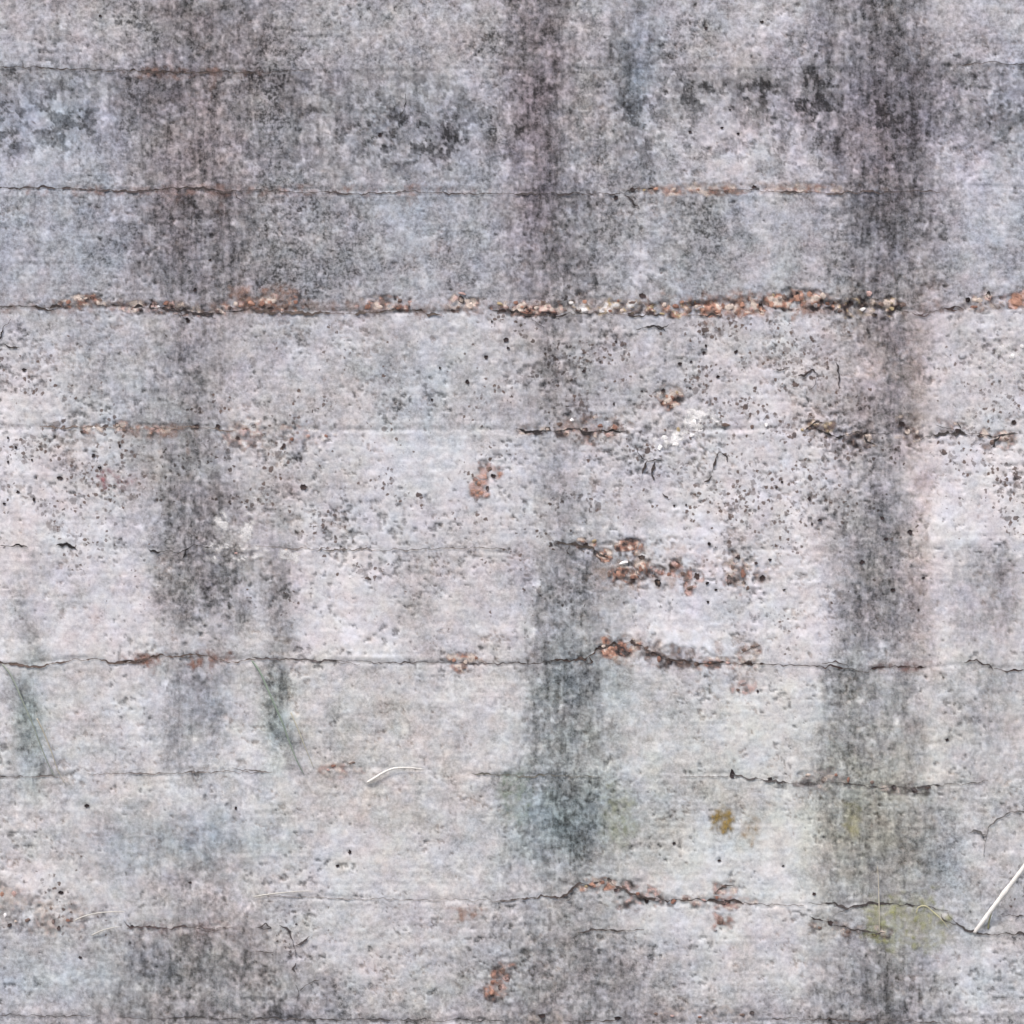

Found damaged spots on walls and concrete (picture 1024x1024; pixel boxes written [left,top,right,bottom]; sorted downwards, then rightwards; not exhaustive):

crack [0,185,658,224]
damp [96,0,598,629]
spalling [449,288,906,323]
damp [834,307,917,536]
spalling [577,538,772,604]
crack [0,641,924,673]
spalling [598,637,761,669]
damp [505,521,636,1024]
crack [692,773,984,794]
crack [269,880,1024,935]
spalling [579,877,738,931]
damp [810,924,941,1024]